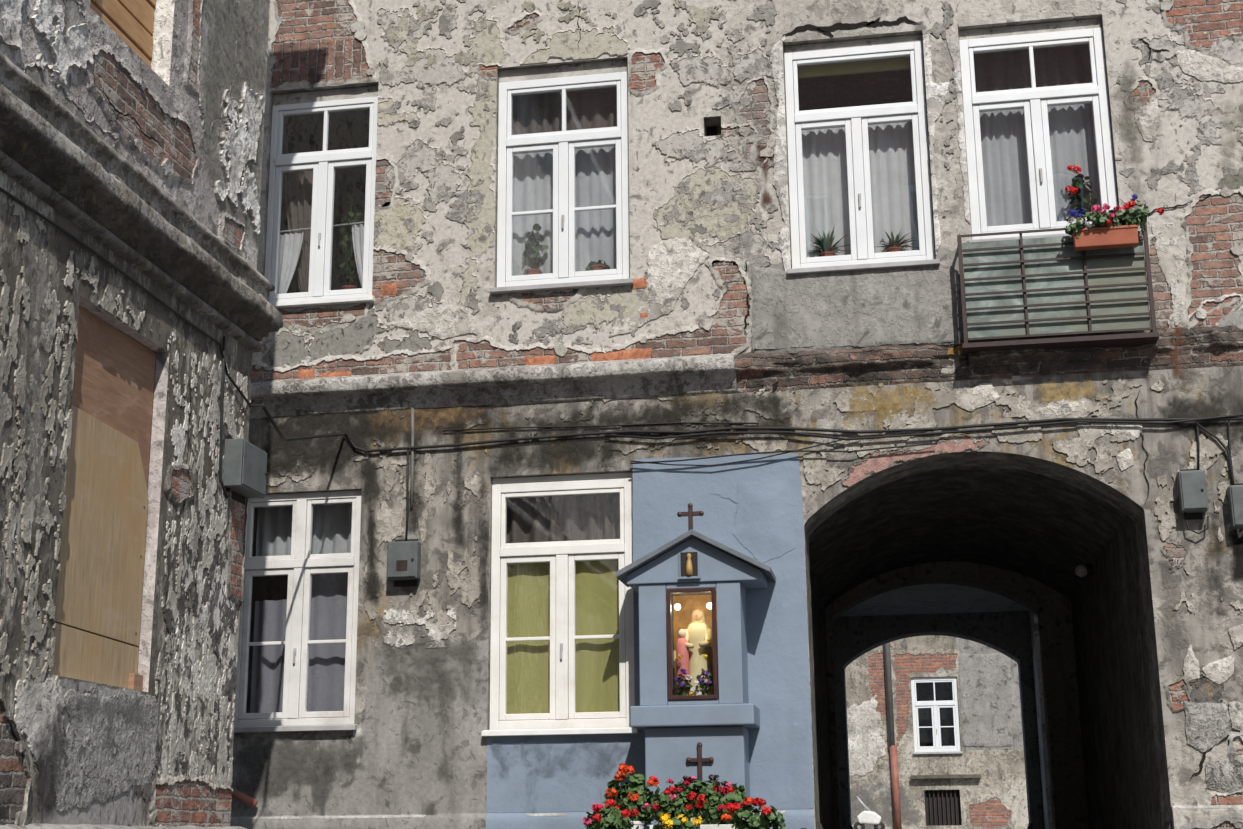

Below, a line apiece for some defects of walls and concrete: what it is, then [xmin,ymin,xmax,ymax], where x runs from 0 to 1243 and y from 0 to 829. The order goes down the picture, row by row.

crack [782,16,921,37]
flaking render [1115,0,1243,333]
flaking render [0,0,798,827]
damp [850,386,932,436]
damp [1040,382,1093,401]
damp [379,406,476,543]
peeling [1154,433,1243,575]
damp [481,527,489,603]
peeling [1173,592,1195,615]
crack [1190,735,1230,780]
flaking render [1179,788,1243,829]